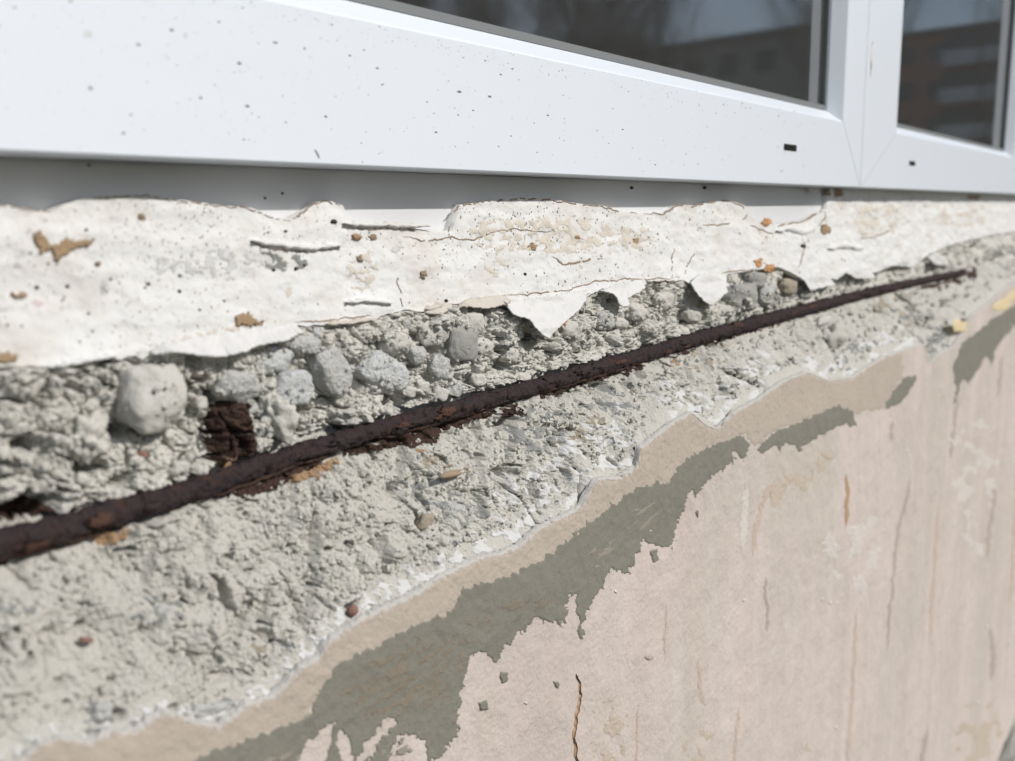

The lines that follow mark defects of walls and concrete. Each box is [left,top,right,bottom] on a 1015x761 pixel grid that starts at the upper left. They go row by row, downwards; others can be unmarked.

corrosion [915,266,978,291]
corrosion [662,323,780,367]
corrosion [540,364,646,399]
corrosion [199,400,258,468]
corrosion [213,401,527,502]
corrosion [0,494,58,523]
spalling [0,232,1015,761]
corrosion [93,528,133,546]
crack [574,675,583,761]